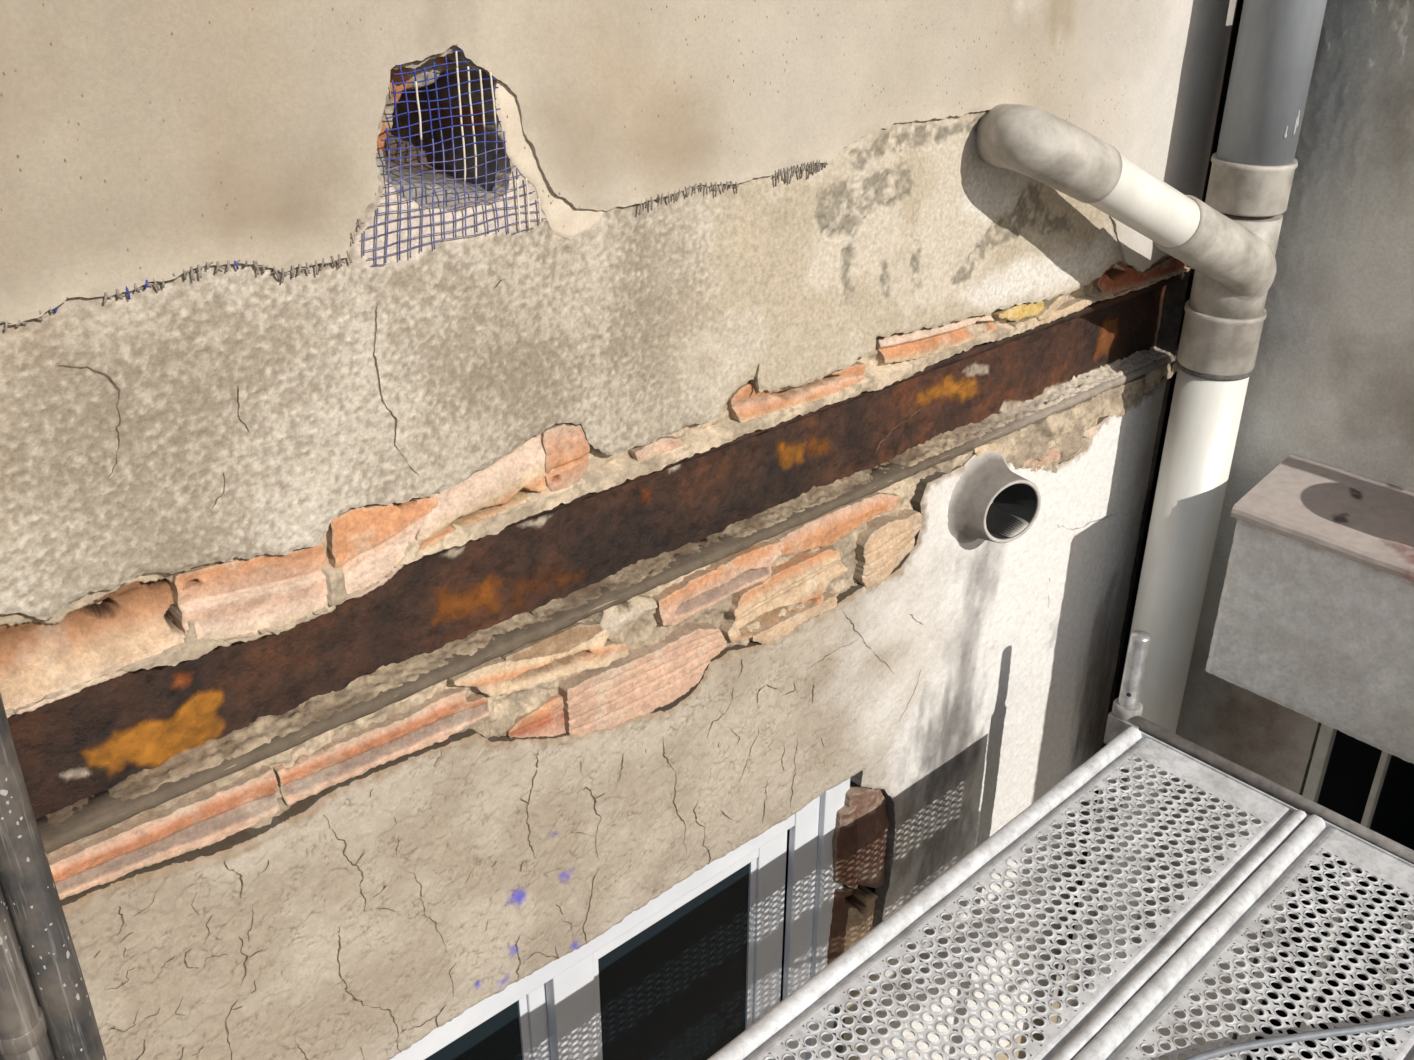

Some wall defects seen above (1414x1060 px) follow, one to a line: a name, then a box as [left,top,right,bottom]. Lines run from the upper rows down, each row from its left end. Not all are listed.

spalling [376,55,605,239]
crack [373,303,419,475]
corrosion [779,441,824,463]
corrosion [918,377,976,403]
corrosion [1094,321,1117,358]
corrosion [441,579,498,618]
spalling [0,256,1193,900]
corrosion [88,692,223,770]
crack [58,365,1167,1060]
spalling [827,780,889,964]
water stain [919,710,977,886]